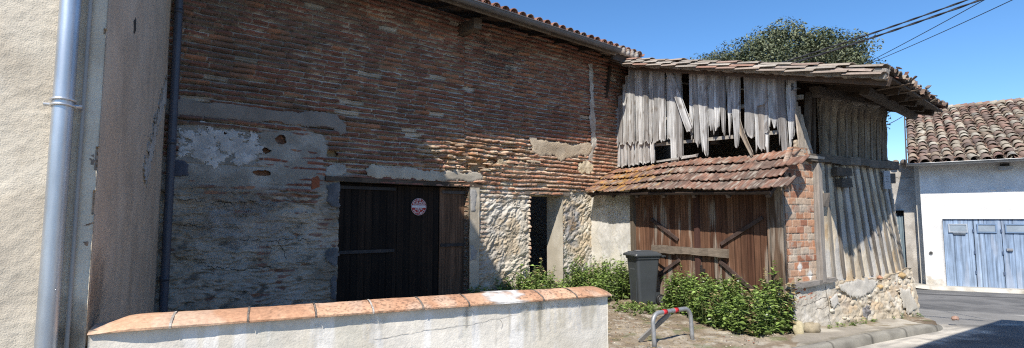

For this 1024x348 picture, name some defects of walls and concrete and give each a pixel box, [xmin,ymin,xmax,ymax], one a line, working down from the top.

flaking render [177,119,285,176]